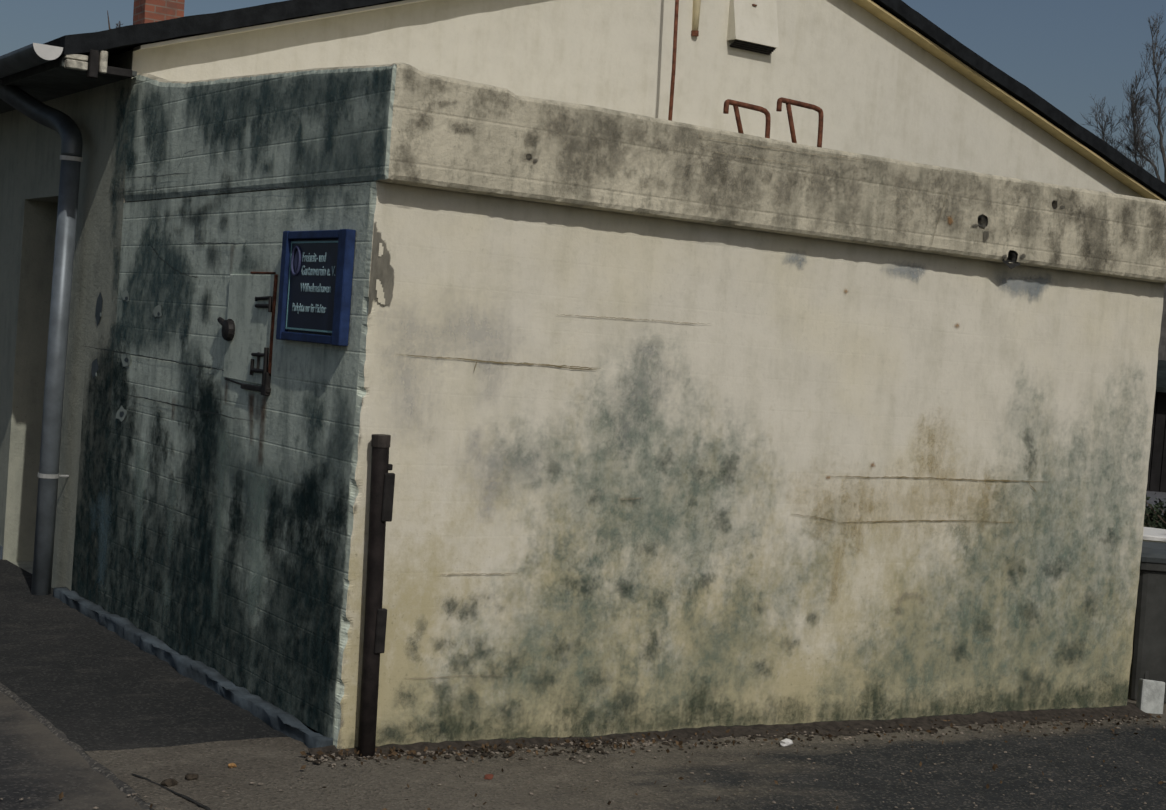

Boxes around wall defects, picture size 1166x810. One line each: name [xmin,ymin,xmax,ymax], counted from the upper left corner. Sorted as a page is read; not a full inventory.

water stain [113,88,212,240]
water stain [187,67,389,211]
peeling [368,222,394,314]
water stain [549,111,642,184]
water stain [1122,202,1134,241]
water stain [184,367,345,543]